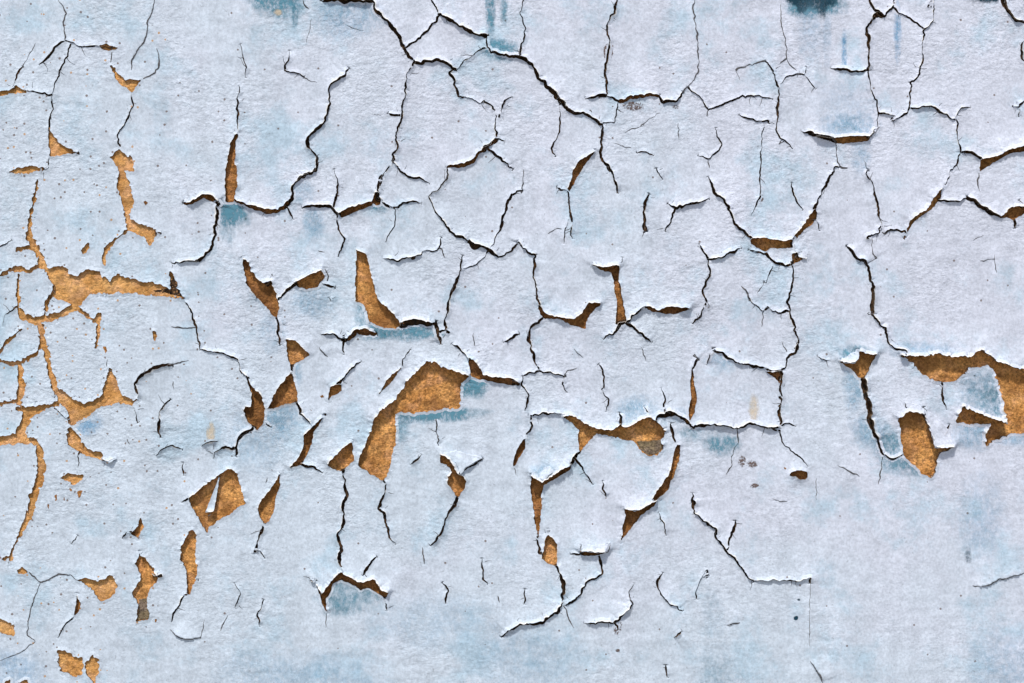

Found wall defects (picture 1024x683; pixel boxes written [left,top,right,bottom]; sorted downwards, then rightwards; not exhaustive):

crack [7,0,160,150]
crack [171,0,1001,412]
peeling [0,128,189,577]
peeling [54,514,166,683]
crack [127,298,257,476]
peeling [304,567,393,624]
peeling [177,247,523,597]
crack [333,468,399,577]
peeling [510,354,701,569]
crack [478,493,823,683]
crack [652,243,817,495]
peeling [816,346,1024,481]